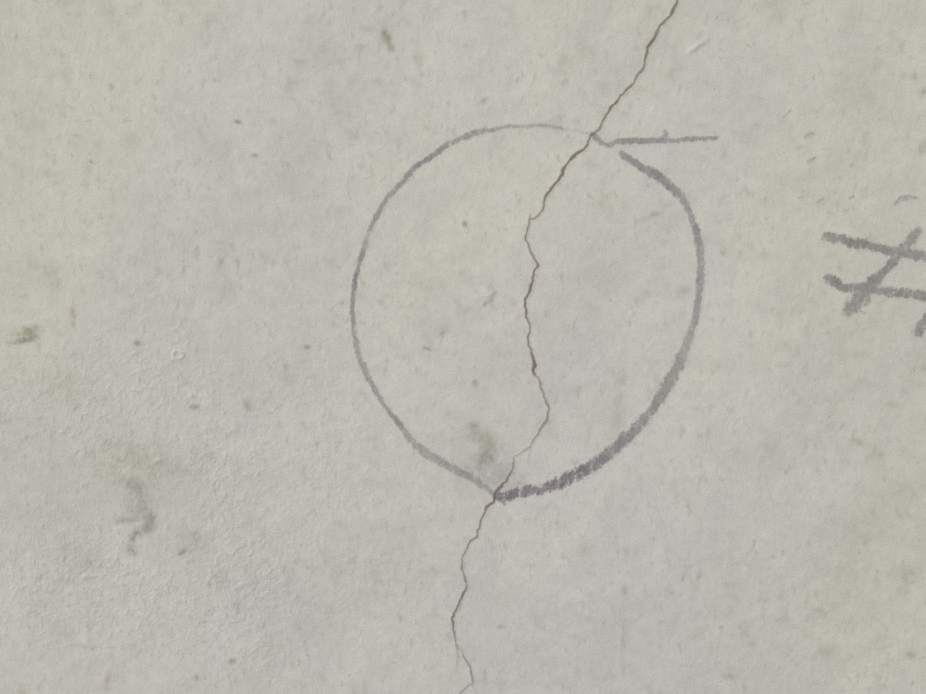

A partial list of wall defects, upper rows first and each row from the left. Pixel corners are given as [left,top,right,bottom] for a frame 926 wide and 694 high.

crack [449,0,680,694]